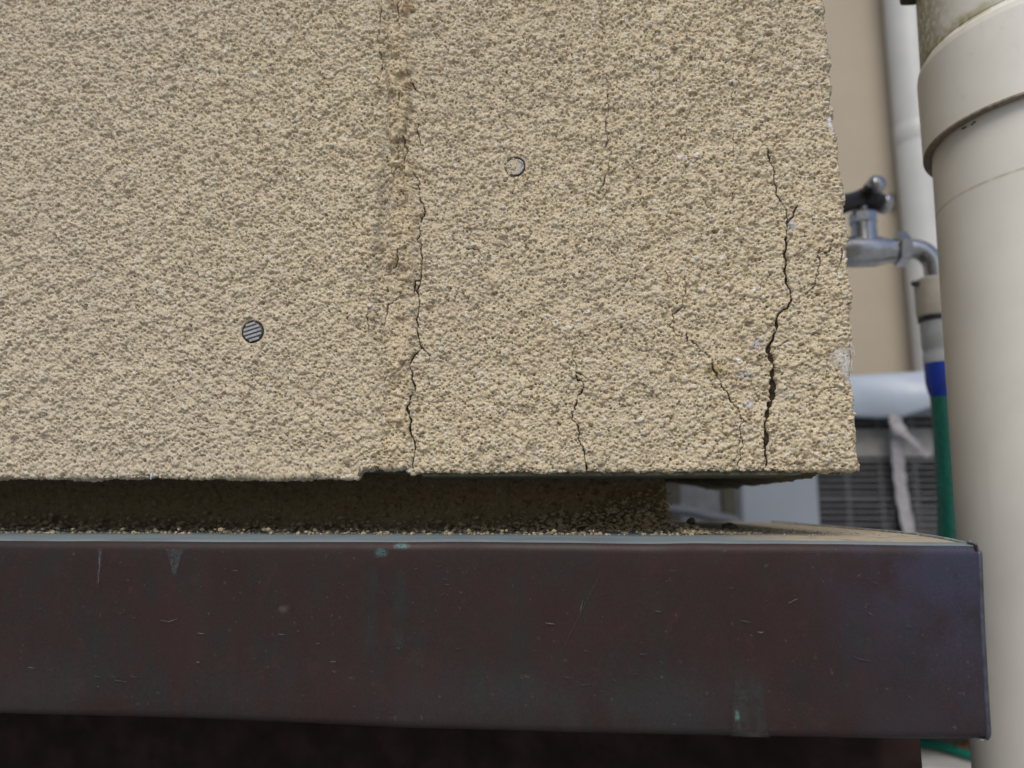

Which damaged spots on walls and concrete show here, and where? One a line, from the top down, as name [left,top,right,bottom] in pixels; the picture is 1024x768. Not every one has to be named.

crack [367,0,430,467]
crack [566,351,588,474]
crack [665,146,843,469]